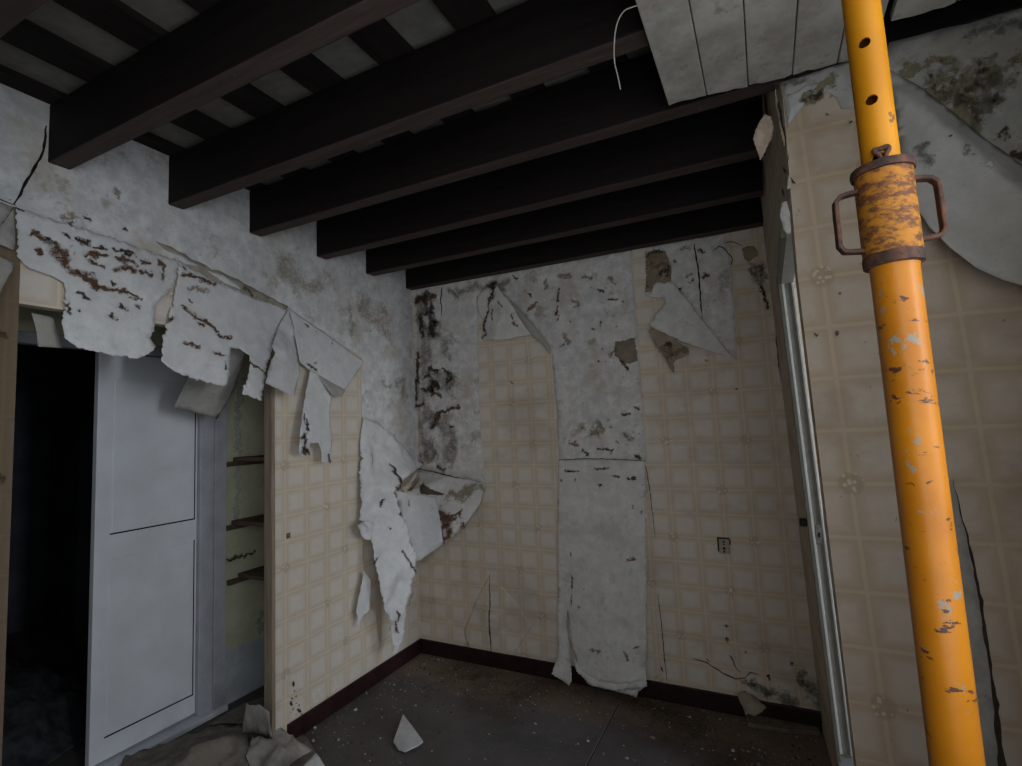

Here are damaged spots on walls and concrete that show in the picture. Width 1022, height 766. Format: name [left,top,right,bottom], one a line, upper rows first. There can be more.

crack [0,125,47,212]
peeling [775,61,854,146]
peeling [887,8,1022,165]
water stain [898,53,1022,133]
water stain [995,126,1022,161]
spalling [780,201,791,235]
peeling [0,83,737,483]
water stain [414,291,437,338]
water stain [415,352,461,429]
crack [953,480,1007,766]